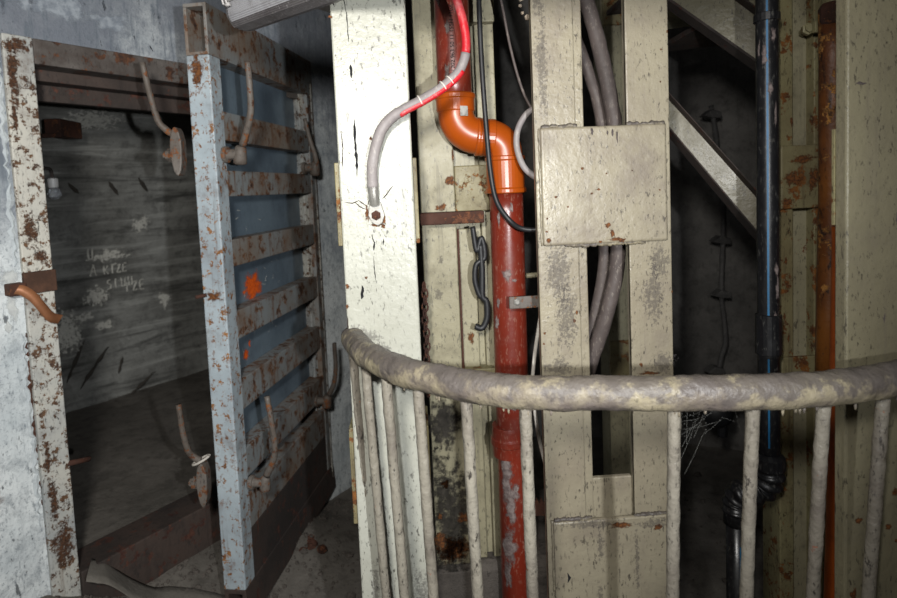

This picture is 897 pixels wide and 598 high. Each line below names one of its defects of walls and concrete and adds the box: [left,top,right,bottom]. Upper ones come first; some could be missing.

corrosion [6,36,29,134]
corrosion [785,155,818,191]
corrosion [24,211,47,263]